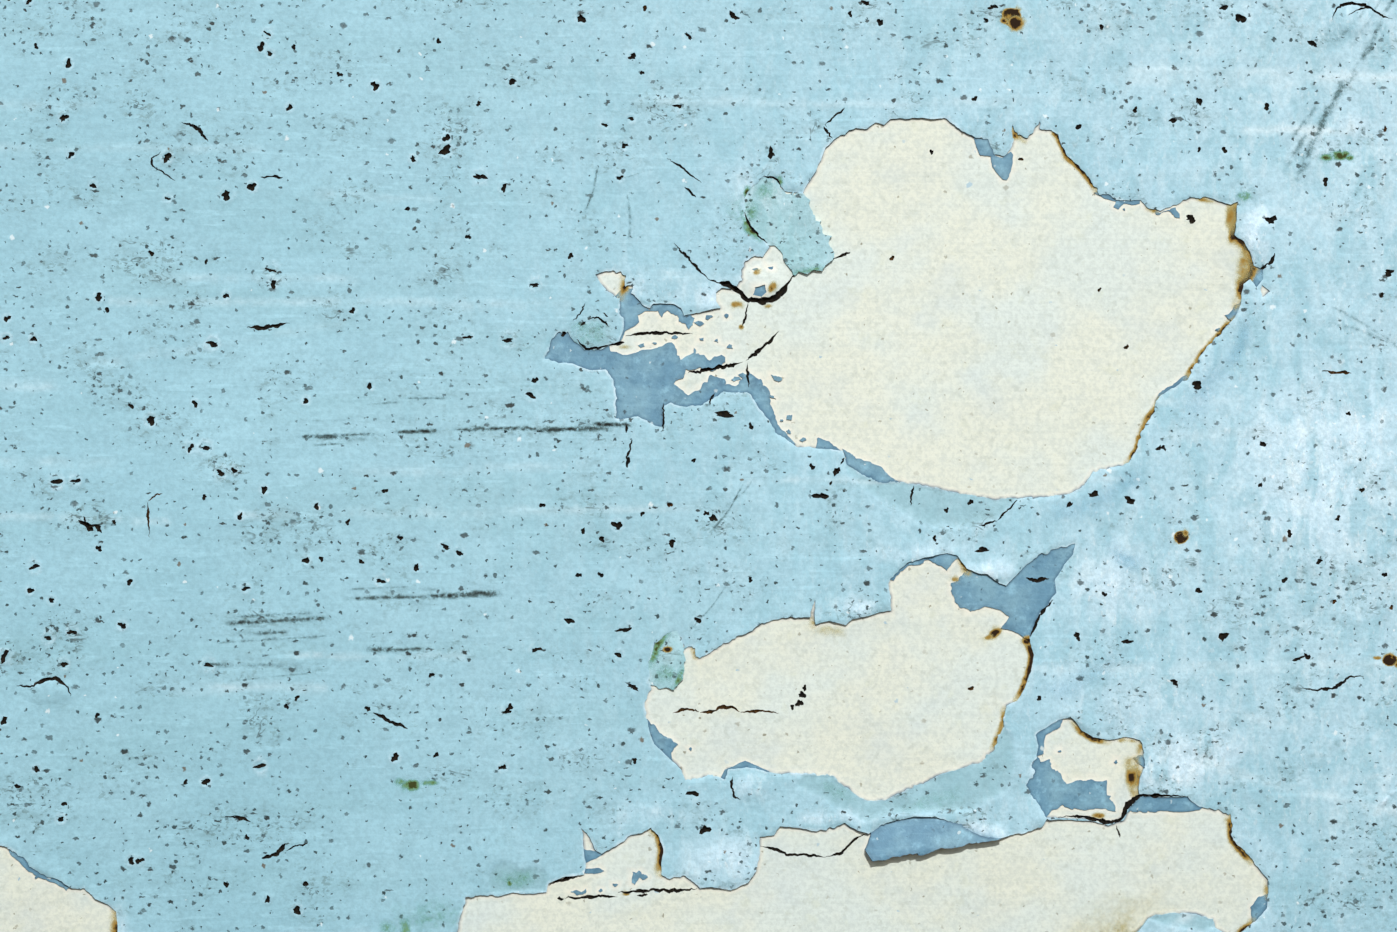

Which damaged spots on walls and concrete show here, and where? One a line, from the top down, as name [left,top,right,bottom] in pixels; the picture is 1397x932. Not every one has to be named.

corrosion [1000,7,1024,31]
corrosion [1052,131,1096,189]
crack [573,304,692,350]
crack [674,243,795,405]
peeling [545,118,1270,500]
corrosion [1186,203,1258,377]
corrosion [1128,400,1157,461]
peeling [644,544,1075,801]
corrosion [992,636,1034,747]
peeling [457,718,1268,932]
crack [1058,793,1188,837]
peeling [0,846,117,932]